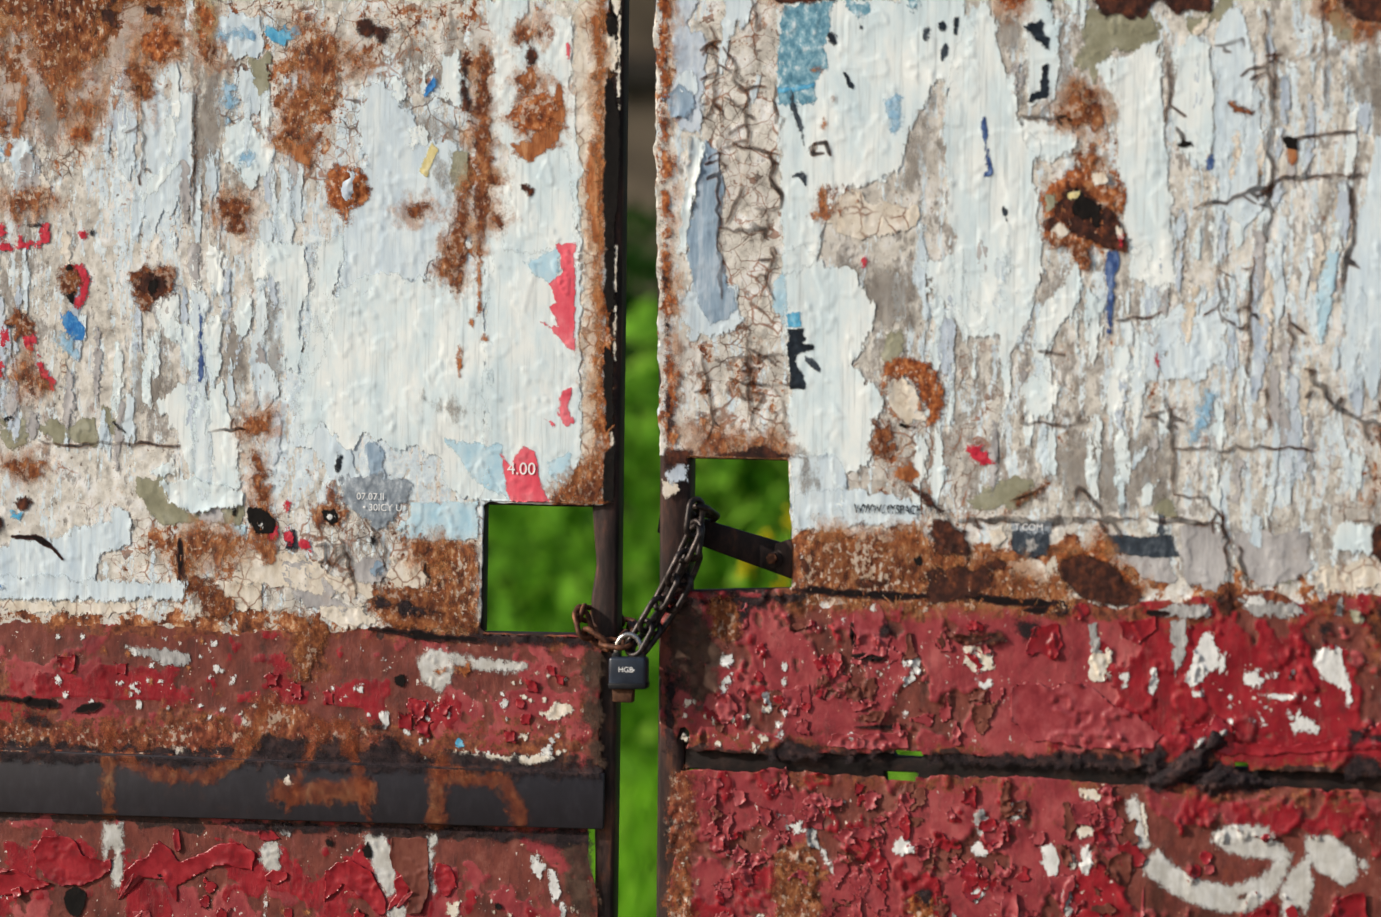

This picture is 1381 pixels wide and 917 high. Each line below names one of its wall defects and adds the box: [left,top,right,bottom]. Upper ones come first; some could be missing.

rust [0,0,218,157]
rust [432,0,568,293]
rust [656,0,794,471]
crack [751,1,759,29]
crack [694,25,833,441]
crack [1193,10,1362,286]
crack [963,268,1381,589]
peeling [135,454,428,630]
rust [796,485,1146,621]
peeling [713,556,1381,756]
peeling [1119,497,1381,697]
peeling [699,767,1147,917]